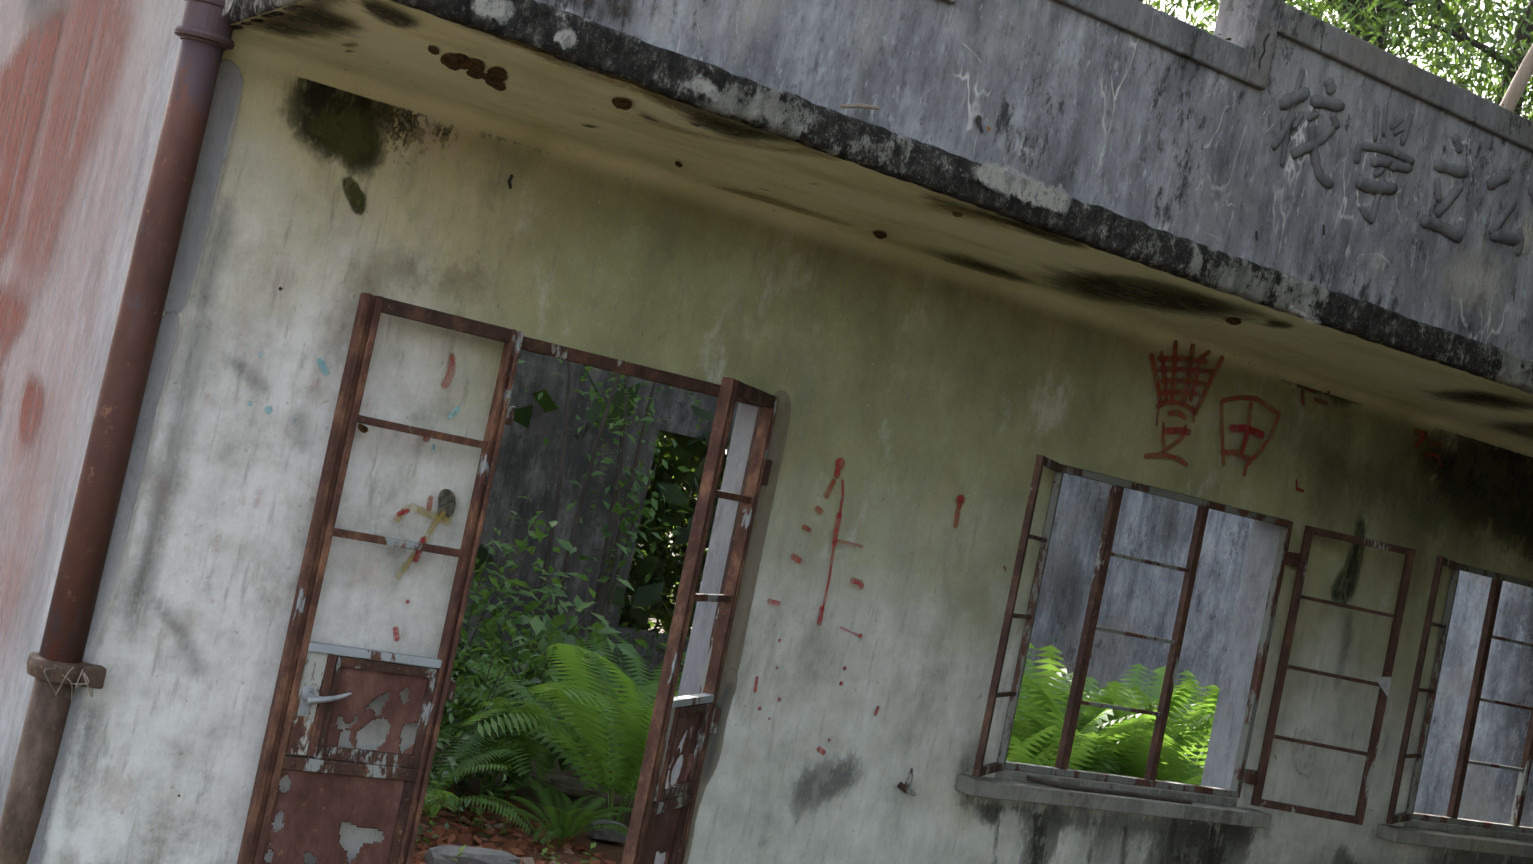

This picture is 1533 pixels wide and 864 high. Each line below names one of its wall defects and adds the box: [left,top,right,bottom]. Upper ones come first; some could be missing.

leakage [288,77,451,214]
leakage [946,255,1023,280]
leakage [1052,270,1291,328]
leakage [796,760,853,807]
leakage [1027,817,1058,864]
leakage [1123,826,1246,864]